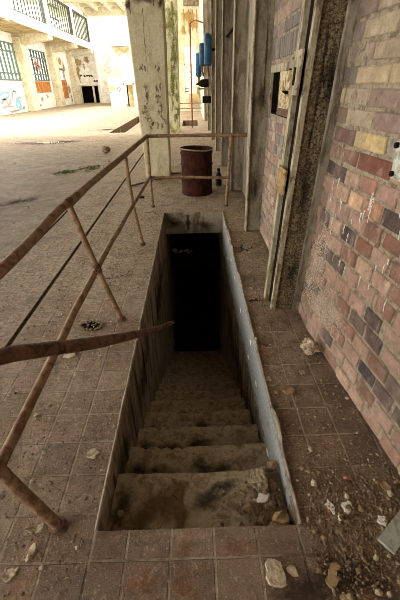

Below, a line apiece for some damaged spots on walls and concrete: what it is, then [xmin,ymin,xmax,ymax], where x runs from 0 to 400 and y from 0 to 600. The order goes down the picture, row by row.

water stain [198,480,233,507]